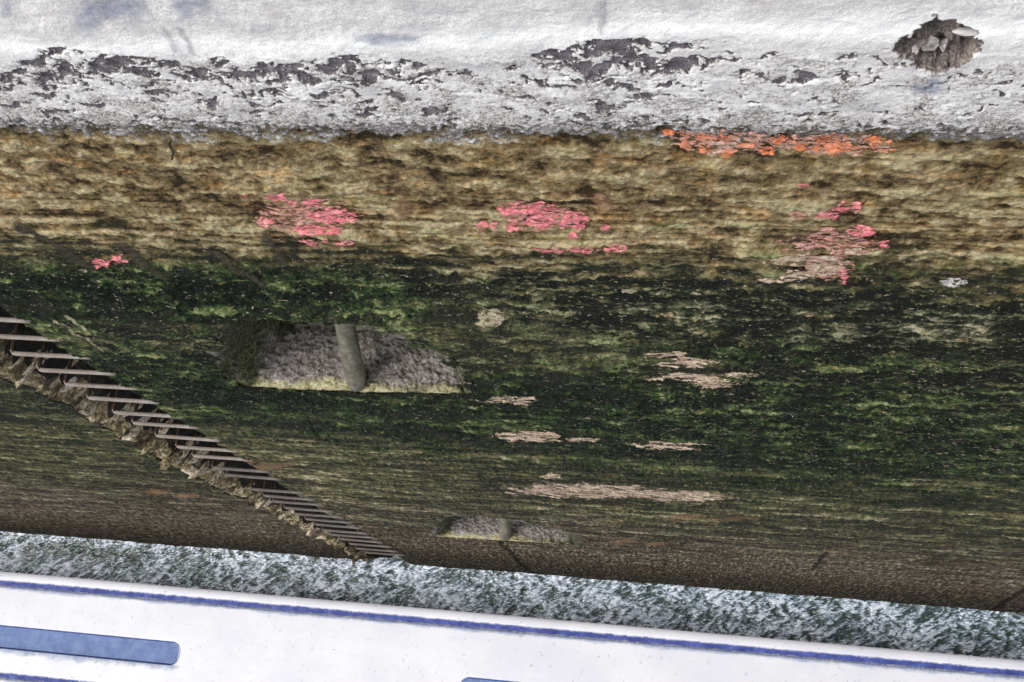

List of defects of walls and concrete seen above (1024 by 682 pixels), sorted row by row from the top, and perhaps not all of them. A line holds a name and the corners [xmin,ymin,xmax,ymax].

spalling [500,14,1024,159]
water stain [13,224,92,268]
water stain [53,315,103,351]
spalling [0,331,376,564]